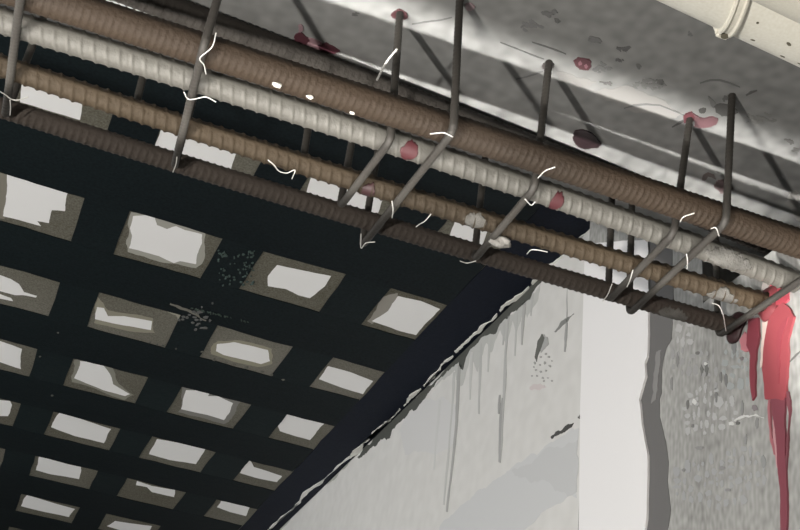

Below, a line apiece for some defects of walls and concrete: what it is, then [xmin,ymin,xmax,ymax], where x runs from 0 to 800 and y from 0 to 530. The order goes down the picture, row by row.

spalling [699,96,738,116]
water stain [357,280,579,530]